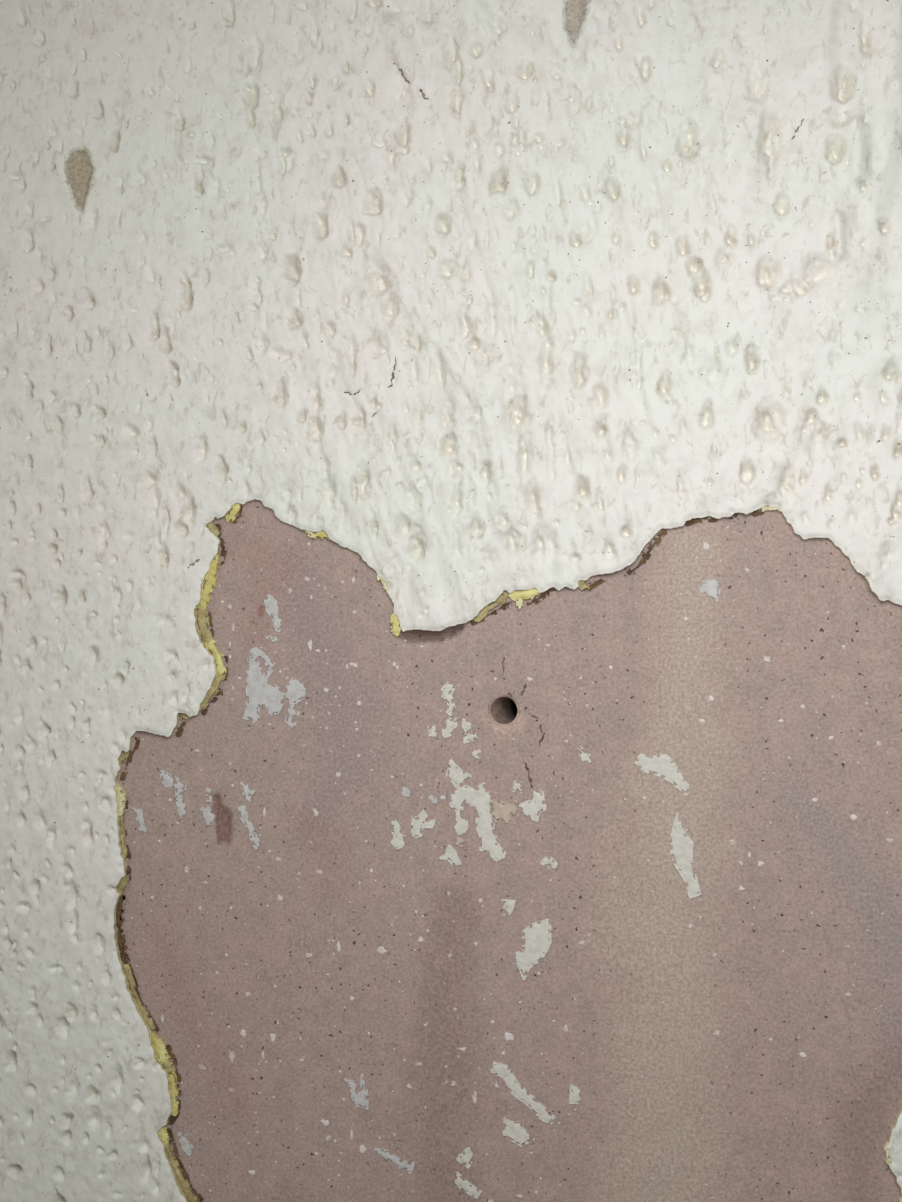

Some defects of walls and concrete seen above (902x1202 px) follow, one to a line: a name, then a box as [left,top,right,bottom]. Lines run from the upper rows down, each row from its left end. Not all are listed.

peeling [114,500,902,1202]